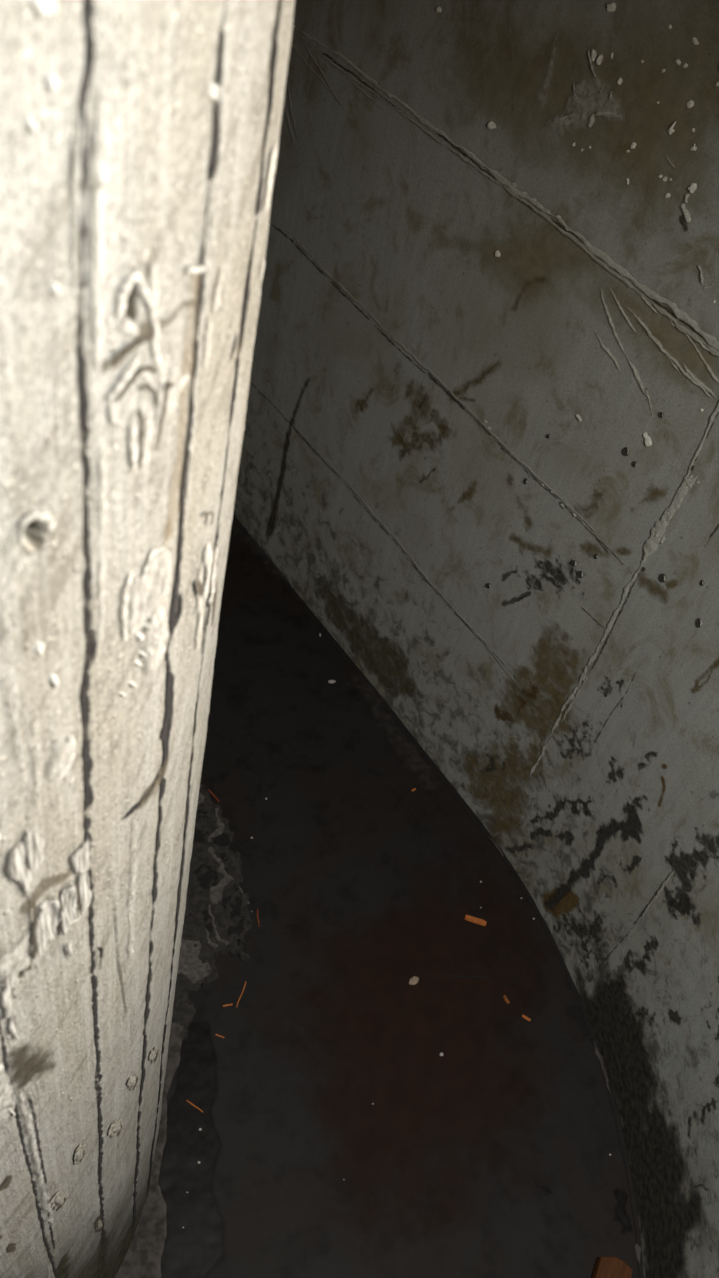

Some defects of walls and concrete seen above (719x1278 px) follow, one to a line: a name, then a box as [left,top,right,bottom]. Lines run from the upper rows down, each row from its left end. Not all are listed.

crack [73,0,229,1278]
crack [215,0,719,1278]
damp [506,796,592,853]
damp [557,722,602,765]
damp [598,677,624,708]
damp [607,757,624,783]
peeling [0,830,92,1039]
damp [545,795,719,1278]